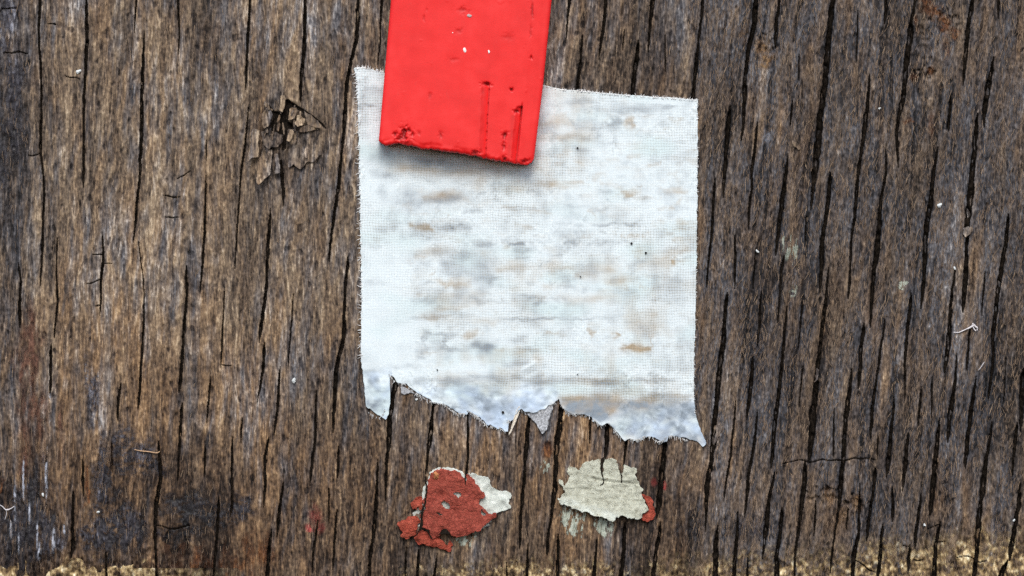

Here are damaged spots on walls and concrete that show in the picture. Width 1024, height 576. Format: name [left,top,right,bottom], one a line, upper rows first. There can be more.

crack [117,0,145,420]
crack [154,142,229,576]
crack [310,0,383,569]
peeling [397,467,512,552]
peeling [558,453,656,522]
crack [704,0,1024,576]